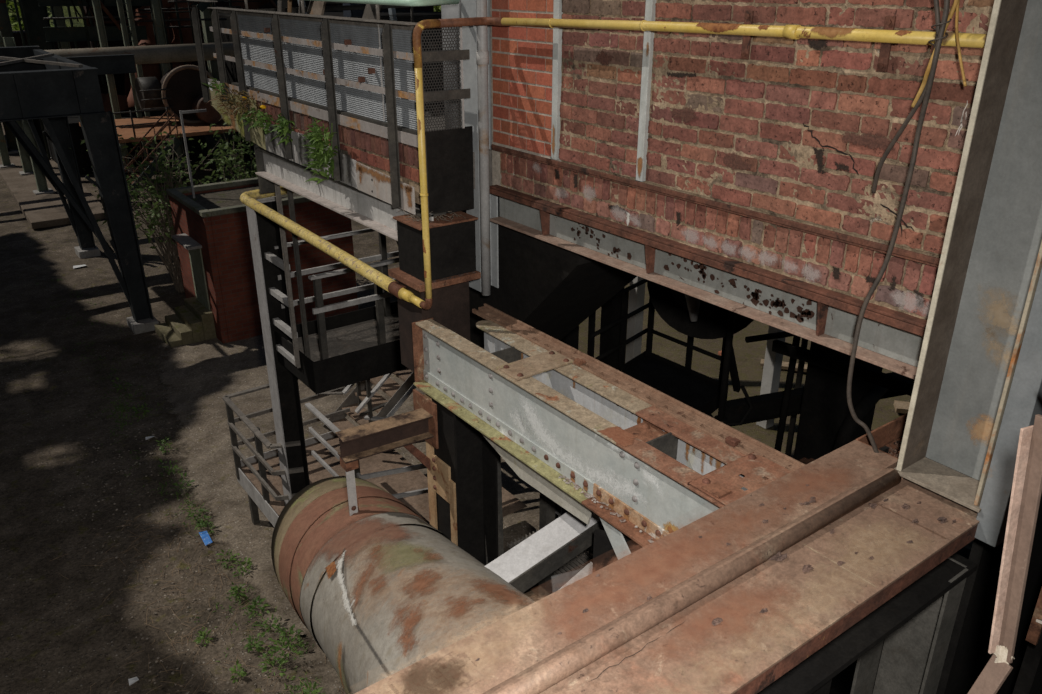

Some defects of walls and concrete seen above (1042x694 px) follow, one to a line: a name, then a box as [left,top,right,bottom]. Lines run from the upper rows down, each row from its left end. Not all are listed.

leakage [614,208,640,226]
leakage [684,230,819,280]
leakage [893,292,931,314]
corrosion [598,416,646,447]
corrosion [685,443,726,472]
corrosion [559,471,654,543]
peeling [311,518,410,626]
corrosion [388,549,441,656]
corrosion [446,579,530,617]